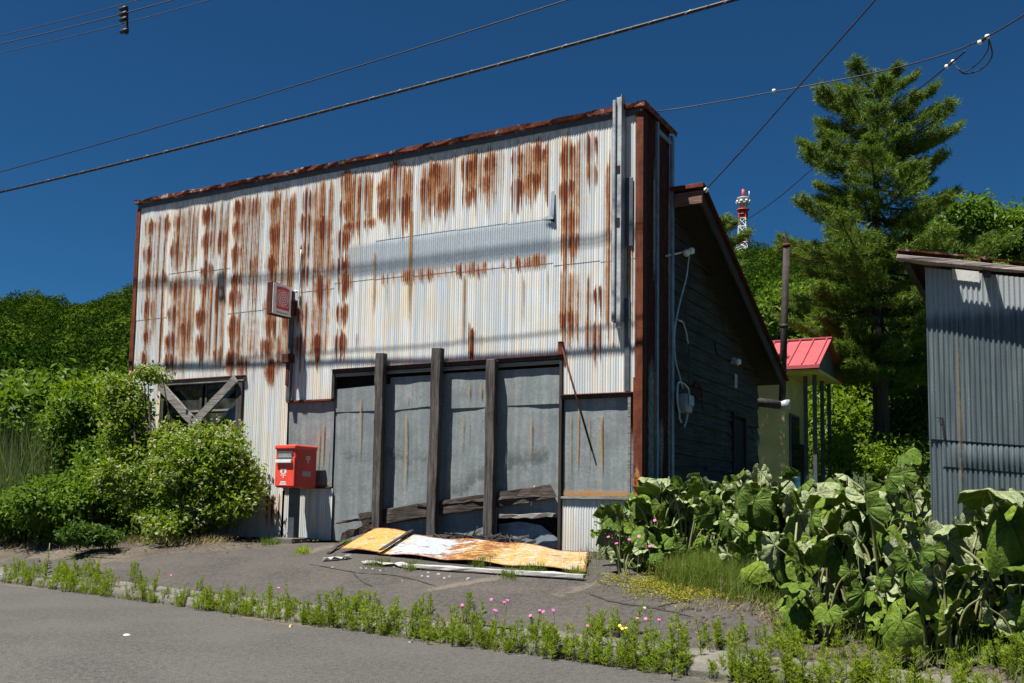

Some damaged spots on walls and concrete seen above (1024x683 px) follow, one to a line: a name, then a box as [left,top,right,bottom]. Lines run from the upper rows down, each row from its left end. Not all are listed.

rust [138,128,614,393]